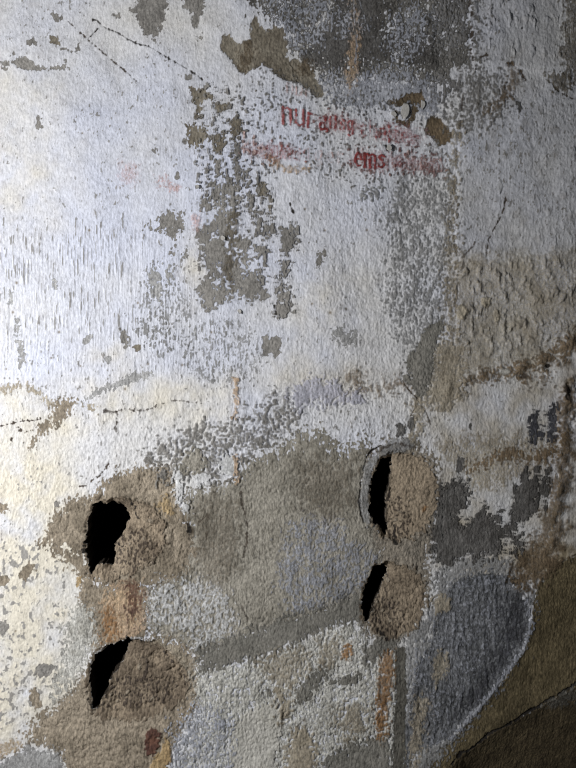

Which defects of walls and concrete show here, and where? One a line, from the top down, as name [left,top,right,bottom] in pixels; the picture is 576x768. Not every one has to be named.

crack [71,19,203,82]
spalling [112,0,522,398]
crack [103,400,197,432]
peeling [18,383,576,768]
crack [451,682,576,765]